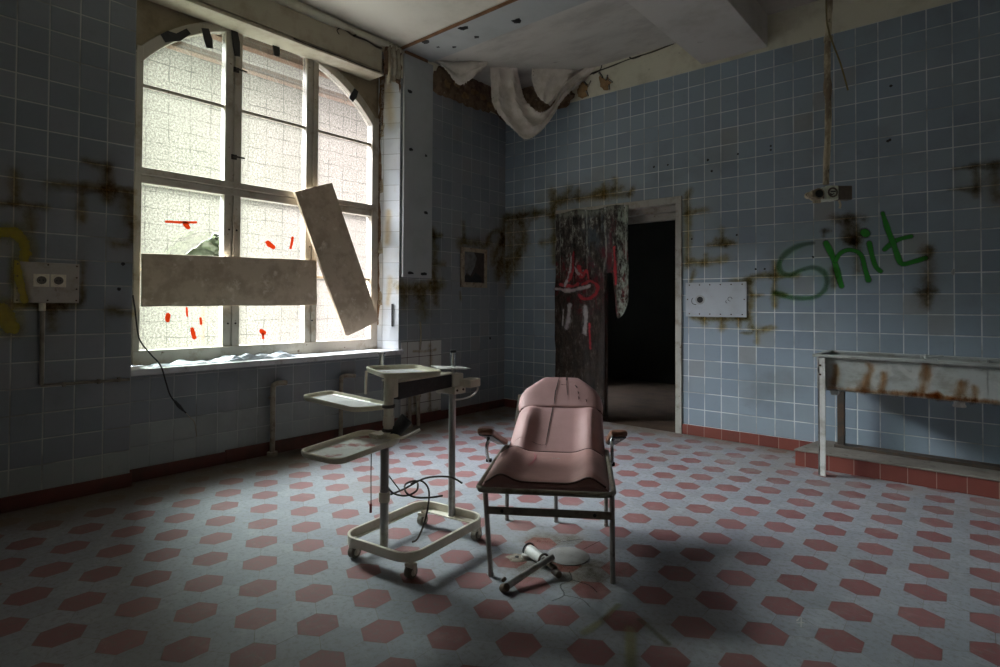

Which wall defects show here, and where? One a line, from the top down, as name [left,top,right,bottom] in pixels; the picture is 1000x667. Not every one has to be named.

flaking render [433,66,506,123]
flaking render [522,72,613,113]